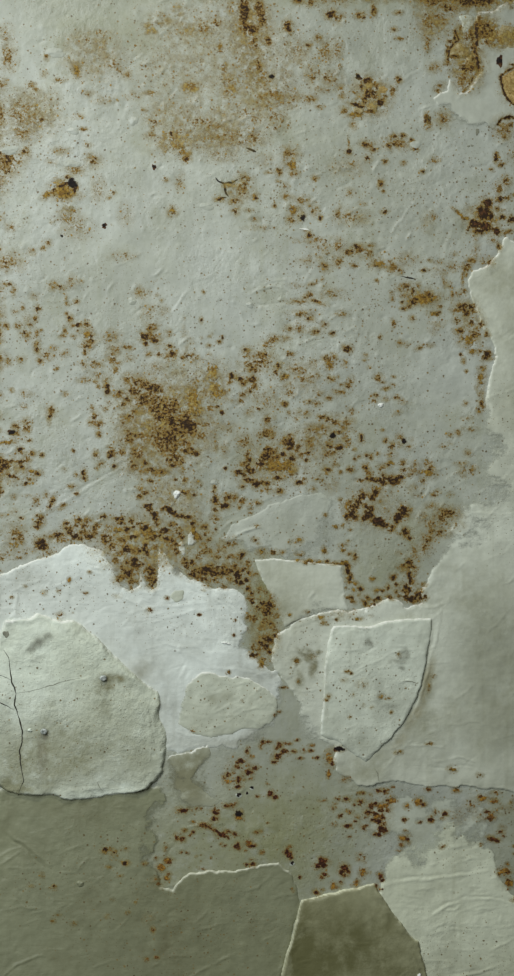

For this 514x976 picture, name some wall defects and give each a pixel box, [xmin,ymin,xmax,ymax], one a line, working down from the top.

peeling [459,15,474,33]
rust [0,0,514,668]
peeling [179,532,197,555]
crack [0,651,79,791]
rust [222,737,351,790]
rust [143,802,268,886]
rust [322,786,513,852]
rust [311,854,385,895]
rust [494,845,514,900]